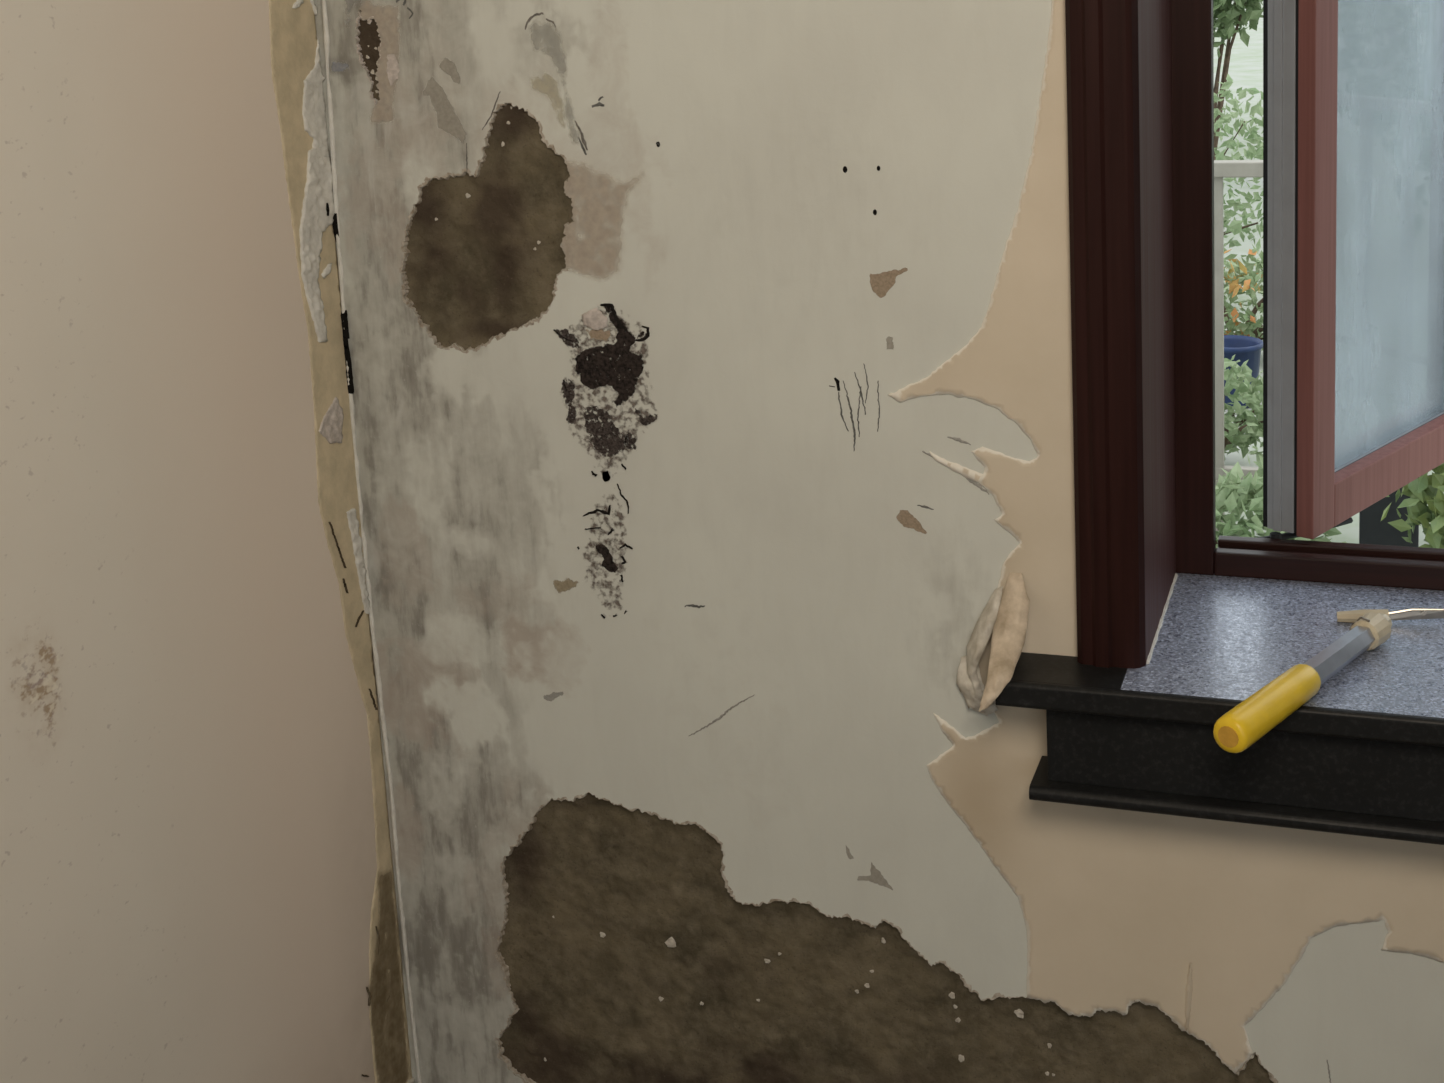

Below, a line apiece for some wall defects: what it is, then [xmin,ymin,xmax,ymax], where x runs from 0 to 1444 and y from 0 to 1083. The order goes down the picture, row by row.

peeling [269,0,412,1083]
mould [554,303,657,619]
flaking render [896,505,934,534]
flaking render [494,792,1278,1083]